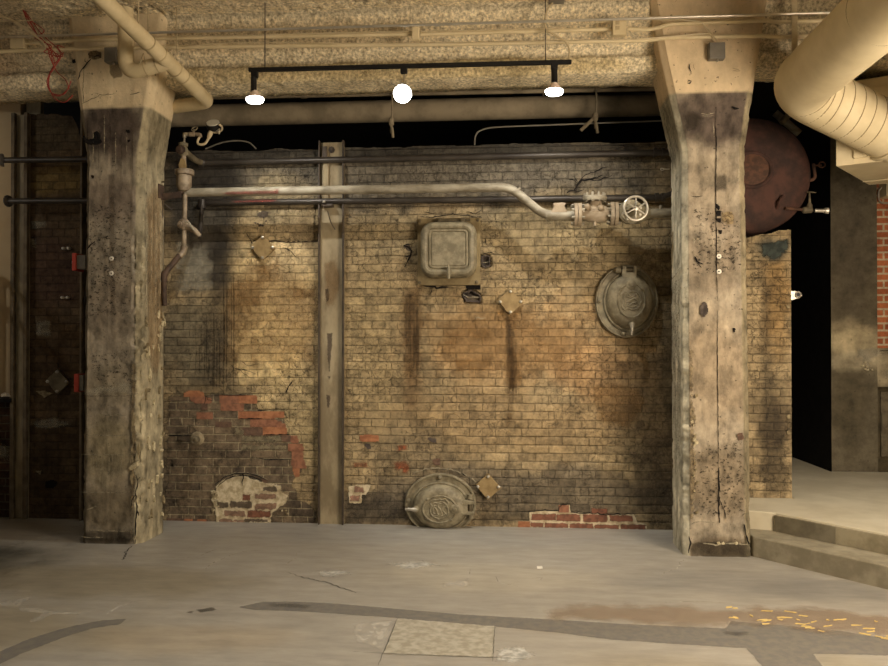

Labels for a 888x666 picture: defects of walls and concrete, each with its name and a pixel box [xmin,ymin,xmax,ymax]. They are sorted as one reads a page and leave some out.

crack [567,167,612,193]
peeling [92,310,317,523]
flaking render [518,503,647,530]